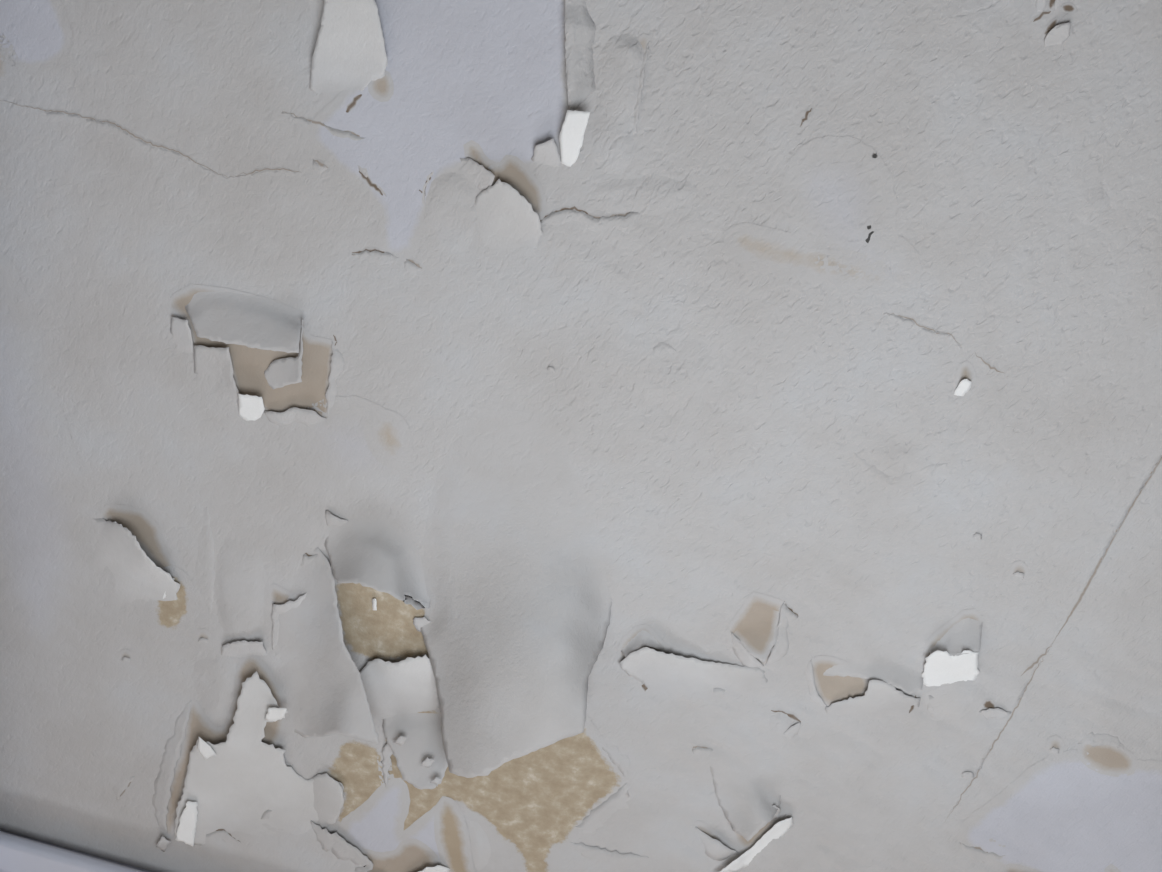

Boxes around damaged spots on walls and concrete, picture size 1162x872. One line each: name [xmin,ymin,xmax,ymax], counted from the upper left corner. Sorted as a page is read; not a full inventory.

peeling [1033,0,1077,46]
crack [0,100,328,181]
crack [282,111,386,195]
peeling [308,0,641,263]
peeling [167,284,345,426]
peeling [92,401,799,872]
peeling [805,609,1012,722]
crack [945,439,1162,821]